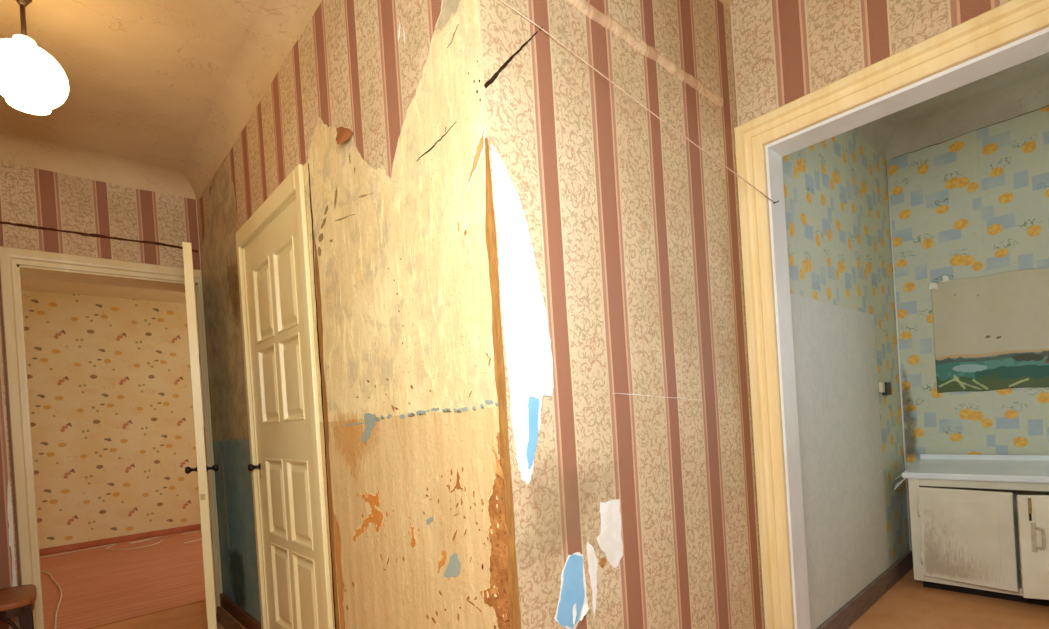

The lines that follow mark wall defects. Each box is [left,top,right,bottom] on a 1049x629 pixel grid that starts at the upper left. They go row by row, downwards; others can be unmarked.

flaking render [439,0,459,28]
crack [484,31,538,88]
crack [417,122,456,161]
flaking render [318,188,355,256]
leakage [227,267,240,315]
peeling [344,379,498,444]
peeling [353,490,394,543]
peeling [380,512,433,571]
flaking render [426,431,512,629]